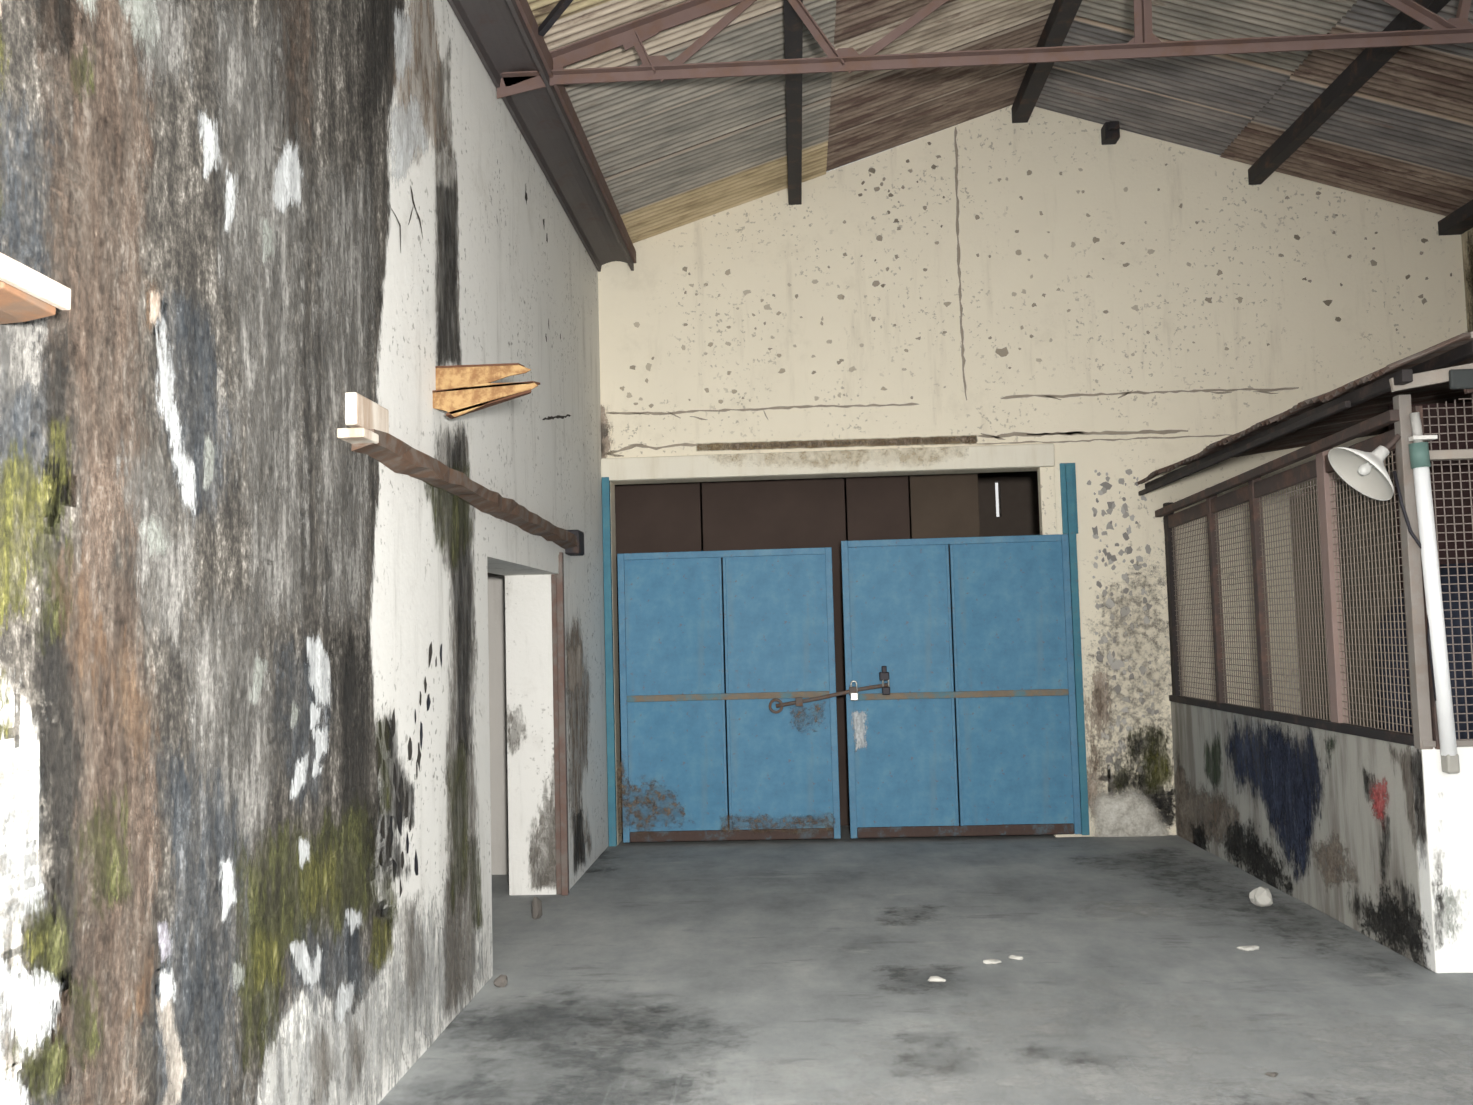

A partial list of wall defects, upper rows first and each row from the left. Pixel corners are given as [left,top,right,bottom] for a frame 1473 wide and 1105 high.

water stain [0,0,714,1105]
peeling [291,635,330,799]
water stain [1088,561,1172,798]
peeling [222,858,236,920]
peeling [299,838,309,865]
peeling [347,909,362,933]
corrosion [617,763,685,839]
corrosion [721,814,835,834]
water stain [1174,757,1239,844]
water stain [1314,833,1458,971]
peeling [290,941,321,989]
peeling [337,984,354,1023]